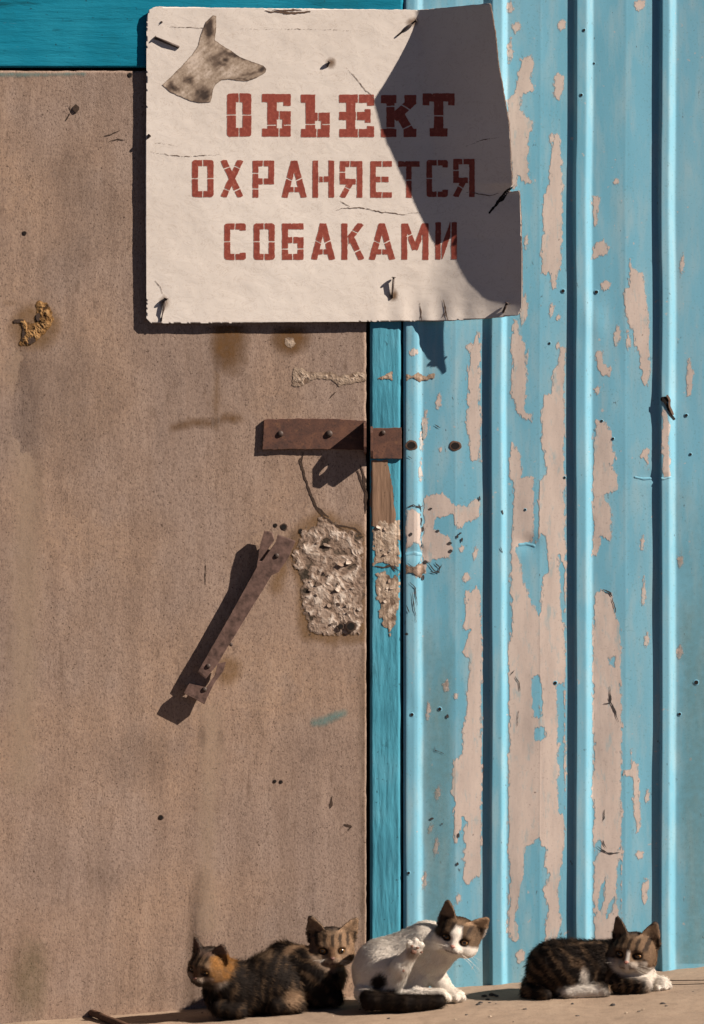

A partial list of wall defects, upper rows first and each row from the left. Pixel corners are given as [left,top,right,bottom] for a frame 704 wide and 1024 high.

peeling [506,2,534,189]
peeling [553,73,564,101]
peeling [540,133,565,289]
spalling [13,300,54,346]
peeling [292,367,393,387]
peeling [613,263,651,386]
crack [299,454,368,536]
spalling [292,460,481,636]
peeling [591,419,618,556]
peeling [506,295,568,964]
peeling [428,573,484,905]
peeling [591,589,650,941]